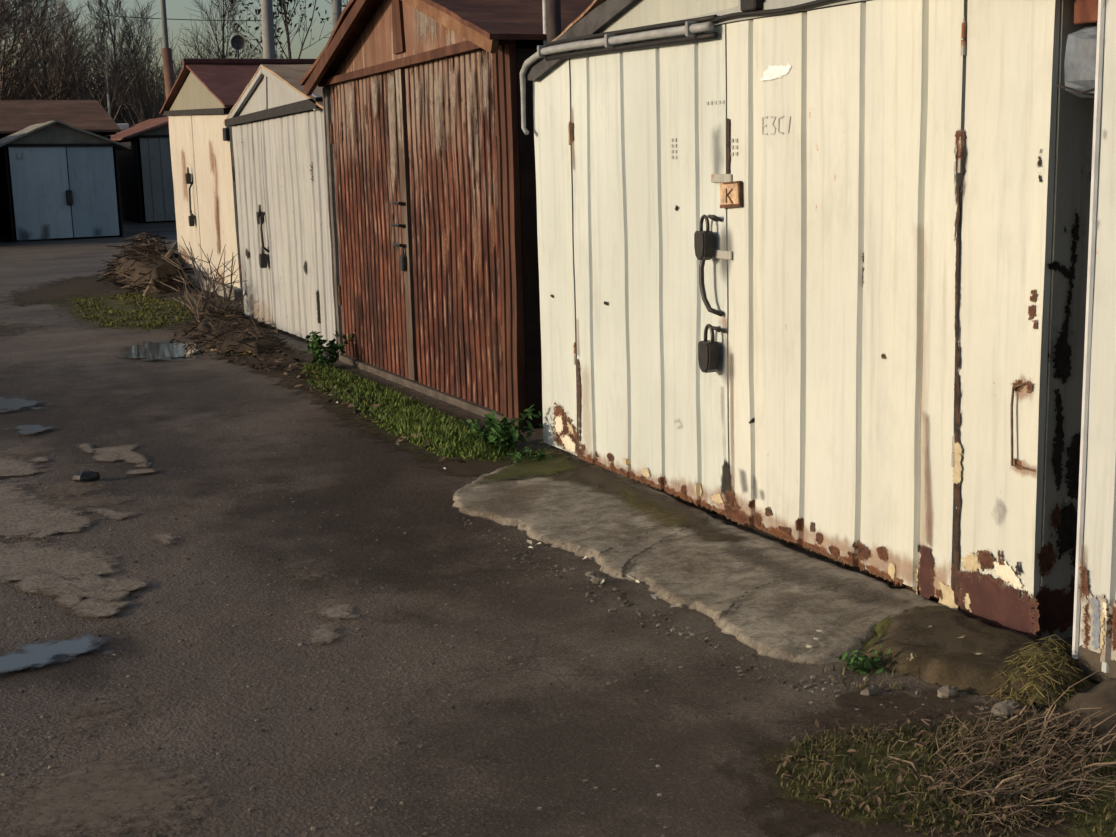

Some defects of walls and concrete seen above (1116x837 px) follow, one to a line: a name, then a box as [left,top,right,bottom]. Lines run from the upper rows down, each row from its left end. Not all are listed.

corrosion [953,129,966,605]
corrosion [1012,379,1033,393]
peeling [551,402,902,586]
crack [598,517,708,577]
crack [719,578,786,619]